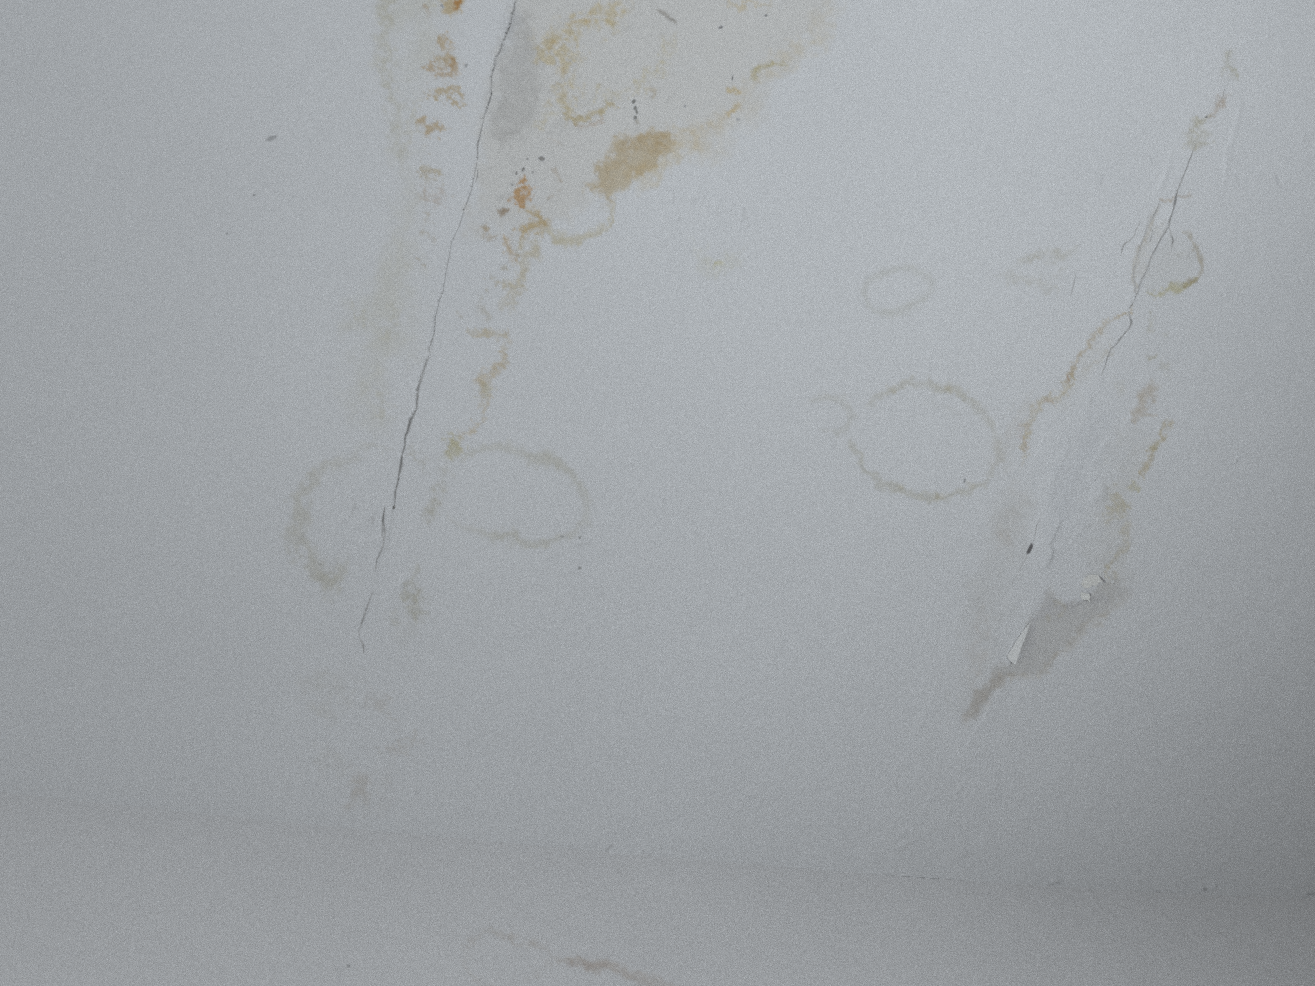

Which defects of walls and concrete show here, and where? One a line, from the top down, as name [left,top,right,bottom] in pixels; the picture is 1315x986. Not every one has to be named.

crack [344,0,517,709]
leakage [277,0,850,607]
leakage [846,189,1207,506]
crack [1088,143,1196,412]